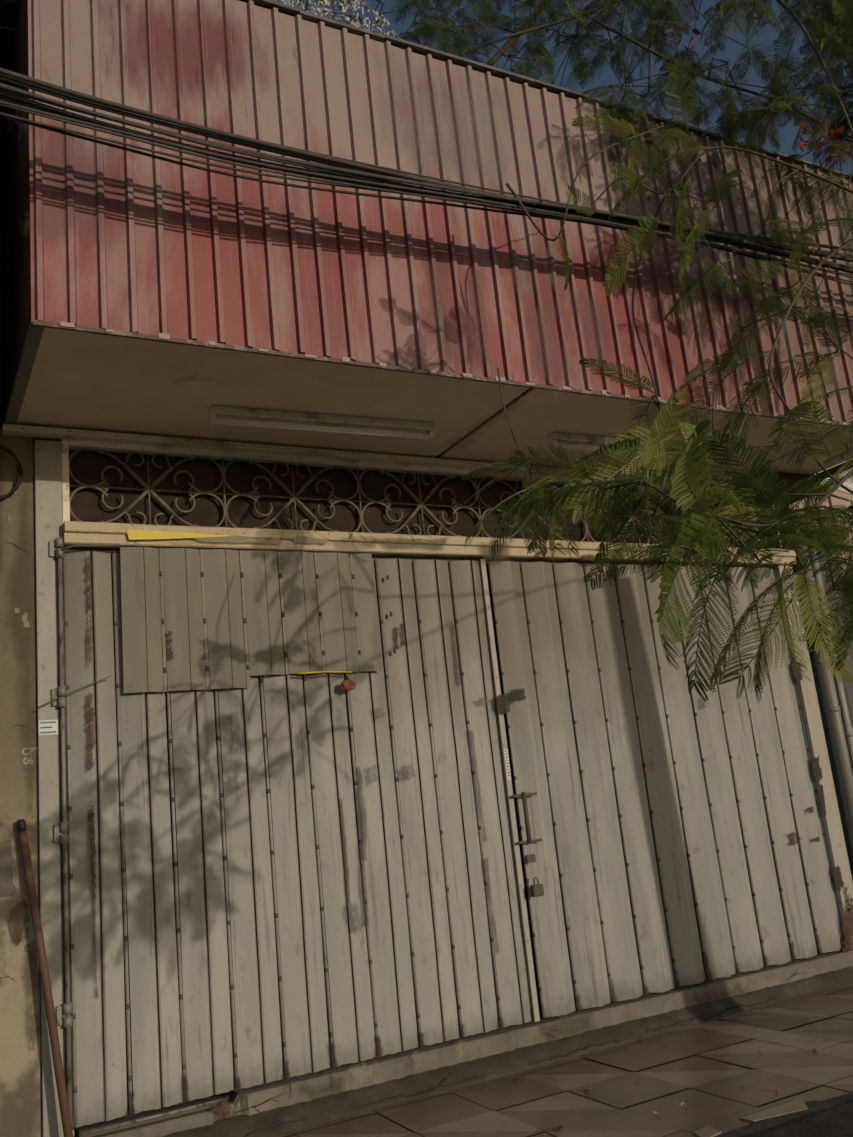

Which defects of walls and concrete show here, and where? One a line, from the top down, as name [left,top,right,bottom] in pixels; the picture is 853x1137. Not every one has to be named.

peeling [0,899,30,952]
corrosion [833,866,853,952]